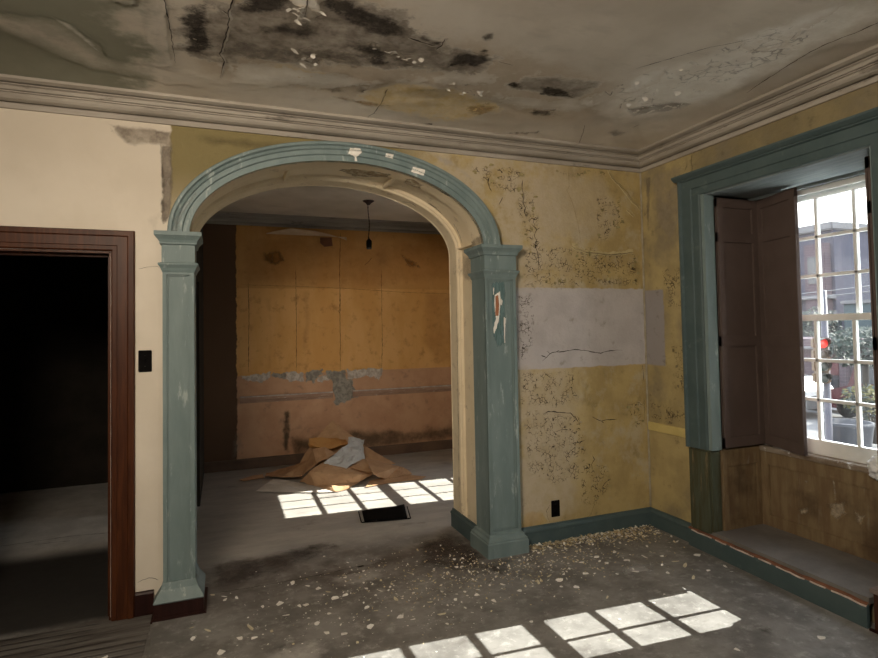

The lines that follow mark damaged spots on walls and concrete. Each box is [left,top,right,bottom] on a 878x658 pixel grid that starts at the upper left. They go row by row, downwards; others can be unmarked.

crack [219,0,235,78]
water stain [163,0,878,131]